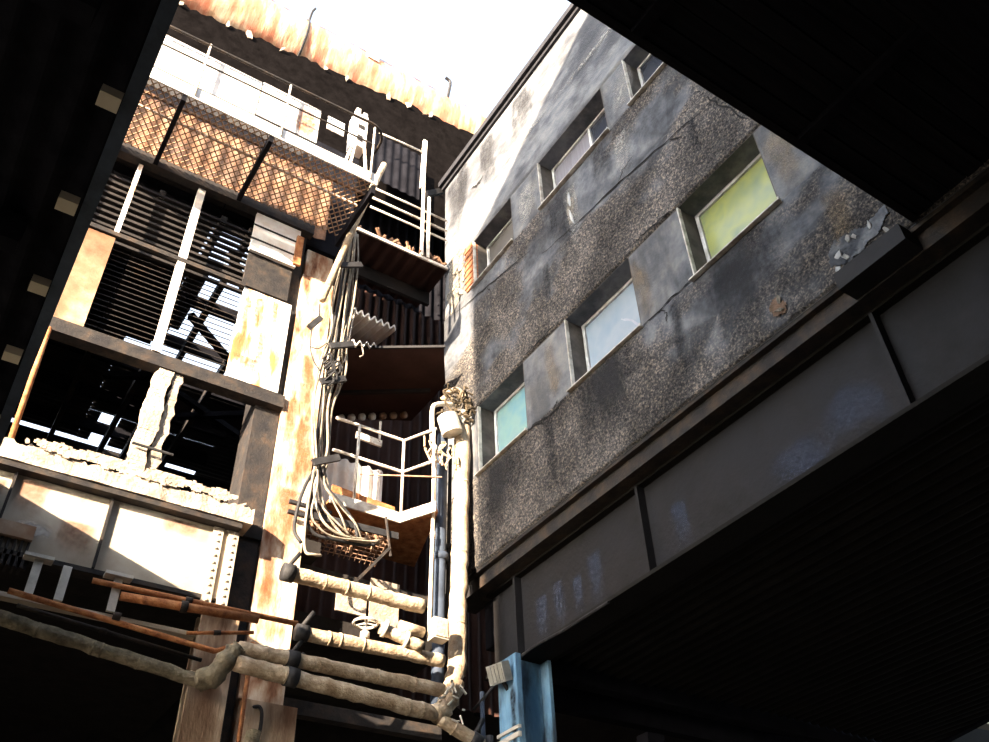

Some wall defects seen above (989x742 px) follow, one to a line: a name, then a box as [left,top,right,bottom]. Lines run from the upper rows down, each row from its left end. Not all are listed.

corrosion [298,109,315,136]
spalling [828,205,889,272]
corrosion [239,298,279,370]
corrosion [301,356,313,390]
corrosion [287,399,309,469]
spalling [25,438,246,506]
corrosion [279,489,299,531]
corrosion [258,559,273,608]